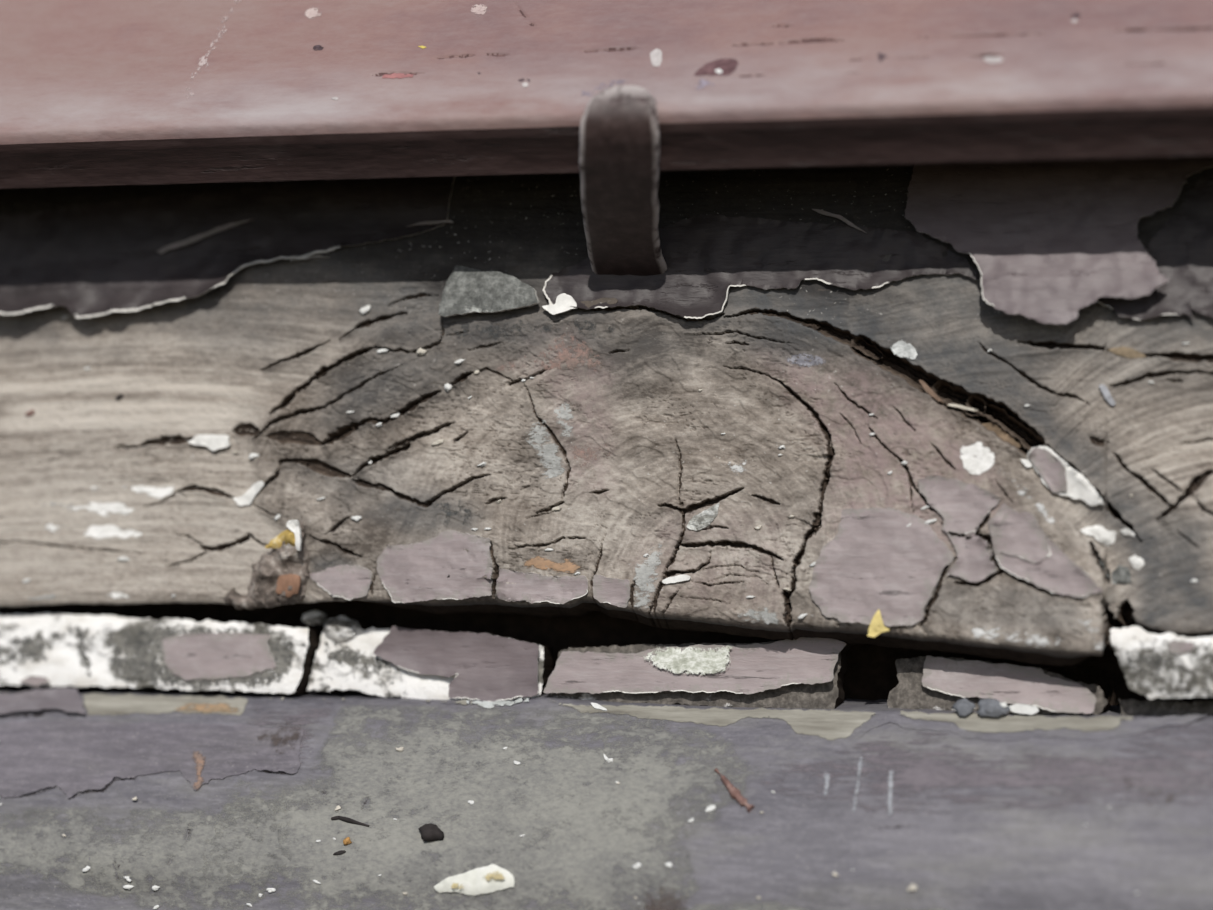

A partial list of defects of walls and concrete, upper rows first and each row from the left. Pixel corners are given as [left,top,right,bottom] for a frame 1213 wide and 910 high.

peeling [0,177,455,319]
peeling [438,156,1213,324]
peeling [891,340,918,359]
crack [0,540,141,554]
crack [119,435,193,449]
crack [148,294,608,601]
peeling [309,530,630,608]
crack [590,305,1213,650]
peeling [809,476,1103,627]
peeling [1027,446,1104,506]
crack [79,778,134,795]
peeling [0,626,1207,910]